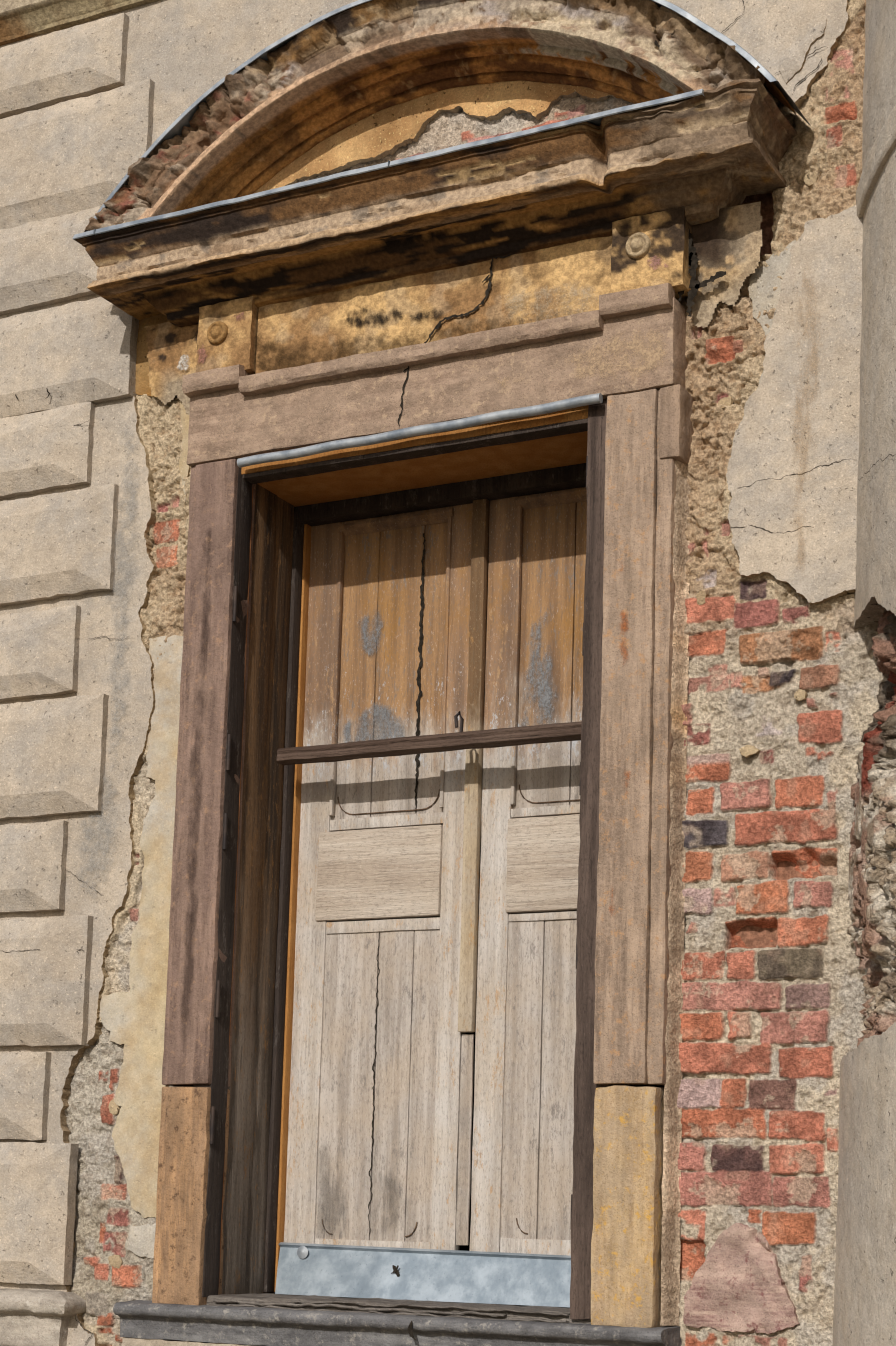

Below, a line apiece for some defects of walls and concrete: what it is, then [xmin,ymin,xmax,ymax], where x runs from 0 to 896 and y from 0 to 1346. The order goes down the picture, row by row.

crack [774,46,828,91]
peeling [177,346,207,370]
crack [398,253,515,426]
spalling [136,394,192,670]
crack [731,525,811,534]
crack [741,454,896,488]
spalling [671,0,896,1346]
spalling [101,746,156,995]
spalling [65,1013,156,1346]